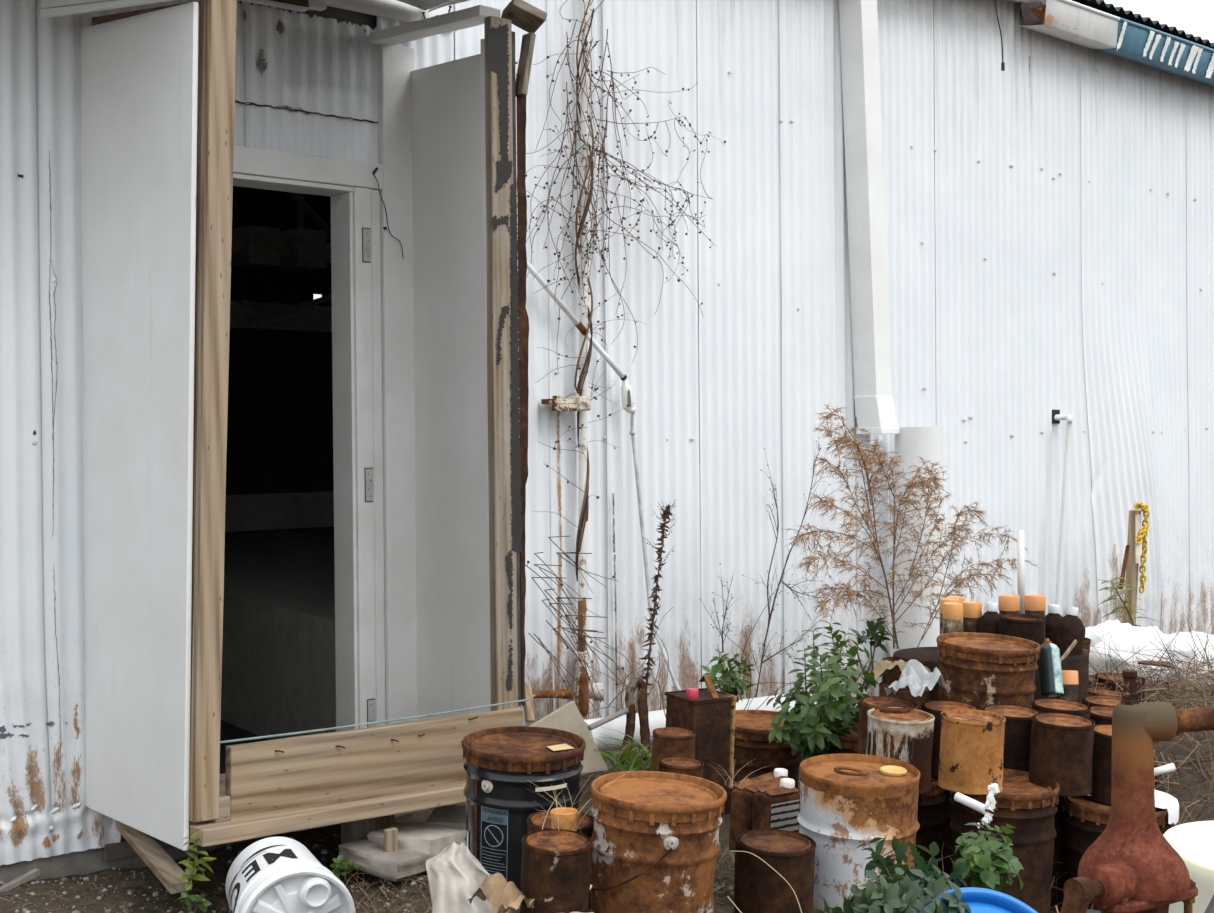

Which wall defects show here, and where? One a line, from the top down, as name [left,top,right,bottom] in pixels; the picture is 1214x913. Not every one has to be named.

rust [516,74,574,726]
peeling [0,723,31,739]
rust [0,742,81,847]